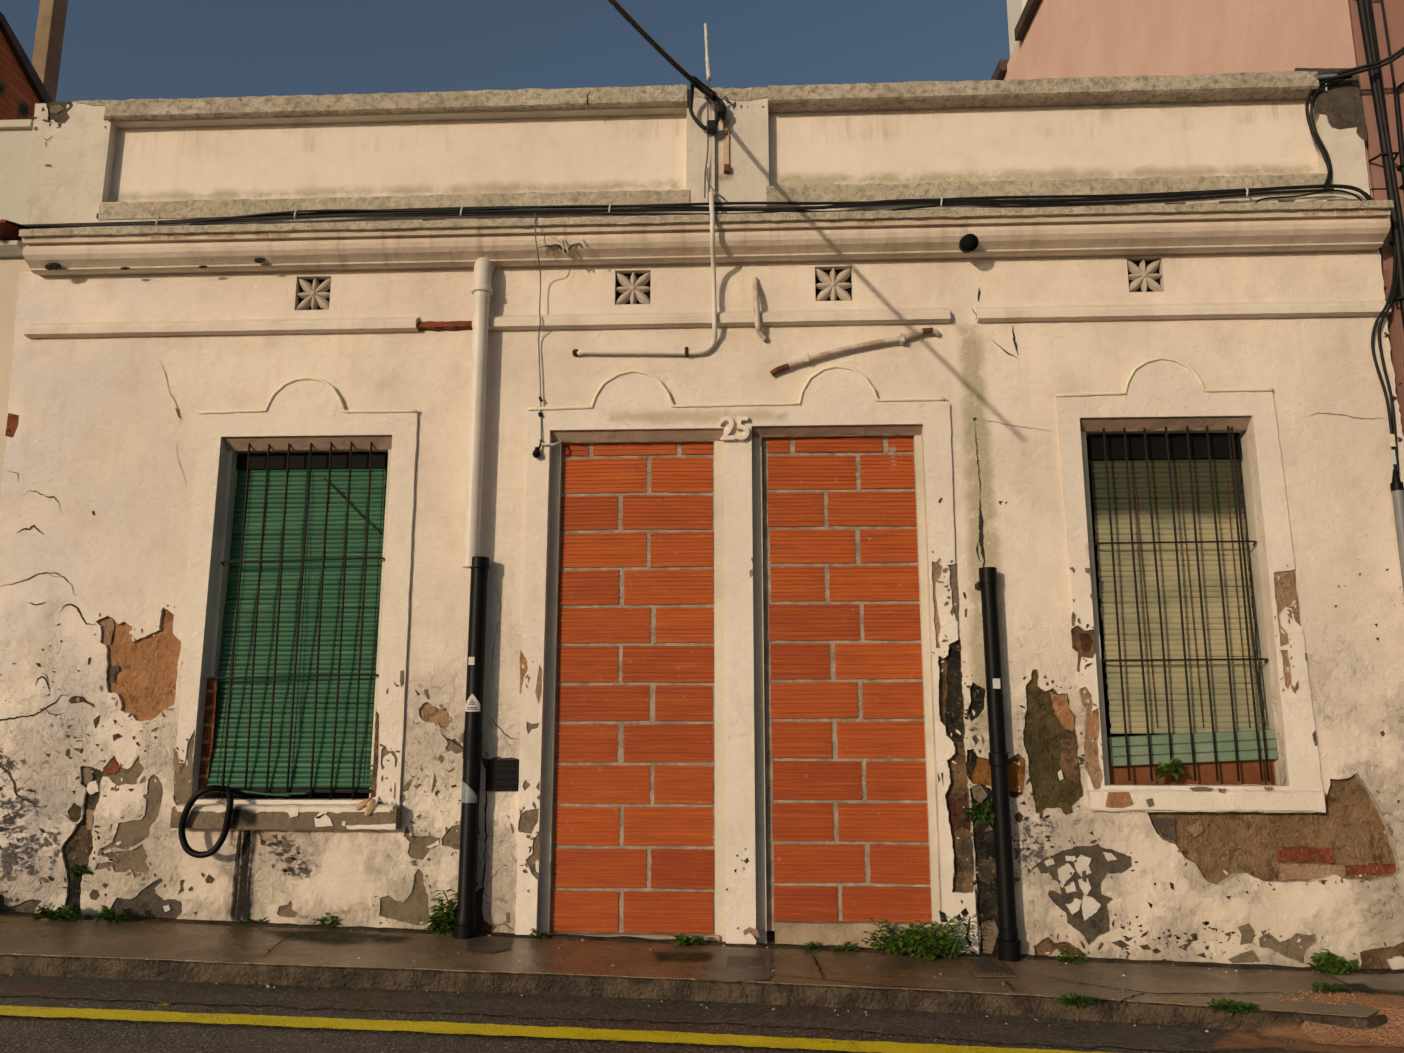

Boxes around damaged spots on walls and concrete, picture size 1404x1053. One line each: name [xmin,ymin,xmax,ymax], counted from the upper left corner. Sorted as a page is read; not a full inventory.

crack [6,470,60,534]
crack [0,572,94,625]
flaking render [35,605,217,918]
flaking render [932,551,1396,964]
peeling [371,670,463,925]
peeling [0,890,41,912]
peeling [1353,941,1404,970]